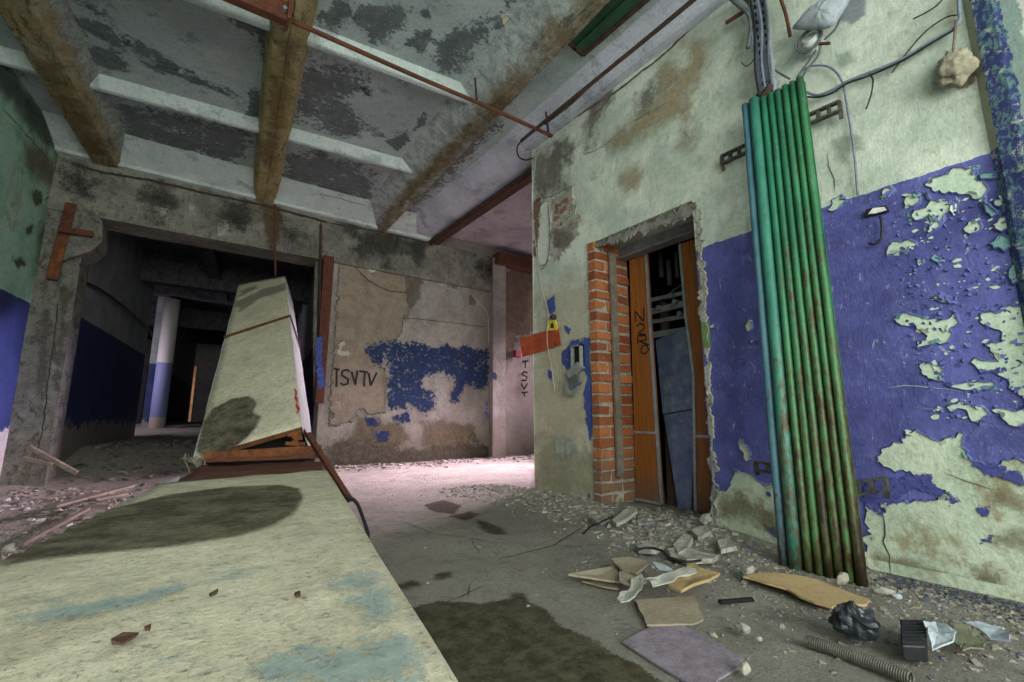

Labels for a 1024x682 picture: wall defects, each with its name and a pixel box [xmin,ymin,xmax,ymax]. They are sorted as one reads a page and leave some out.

leakage [74,1,260,117]
leakage [114,100,255,165]
leakage [227,18,266,59]
leakage [282,147,377,201]
leakage [293,52,430,151]
leakage [535,90,612,200]
leakage [609,42,705,148]
peeling [827,194,848,213]
flaking render [327,264,413,444]
flaking render [506,185,597,441]
peeling [595,202,777,544]
peeling [863,165,1024,603]